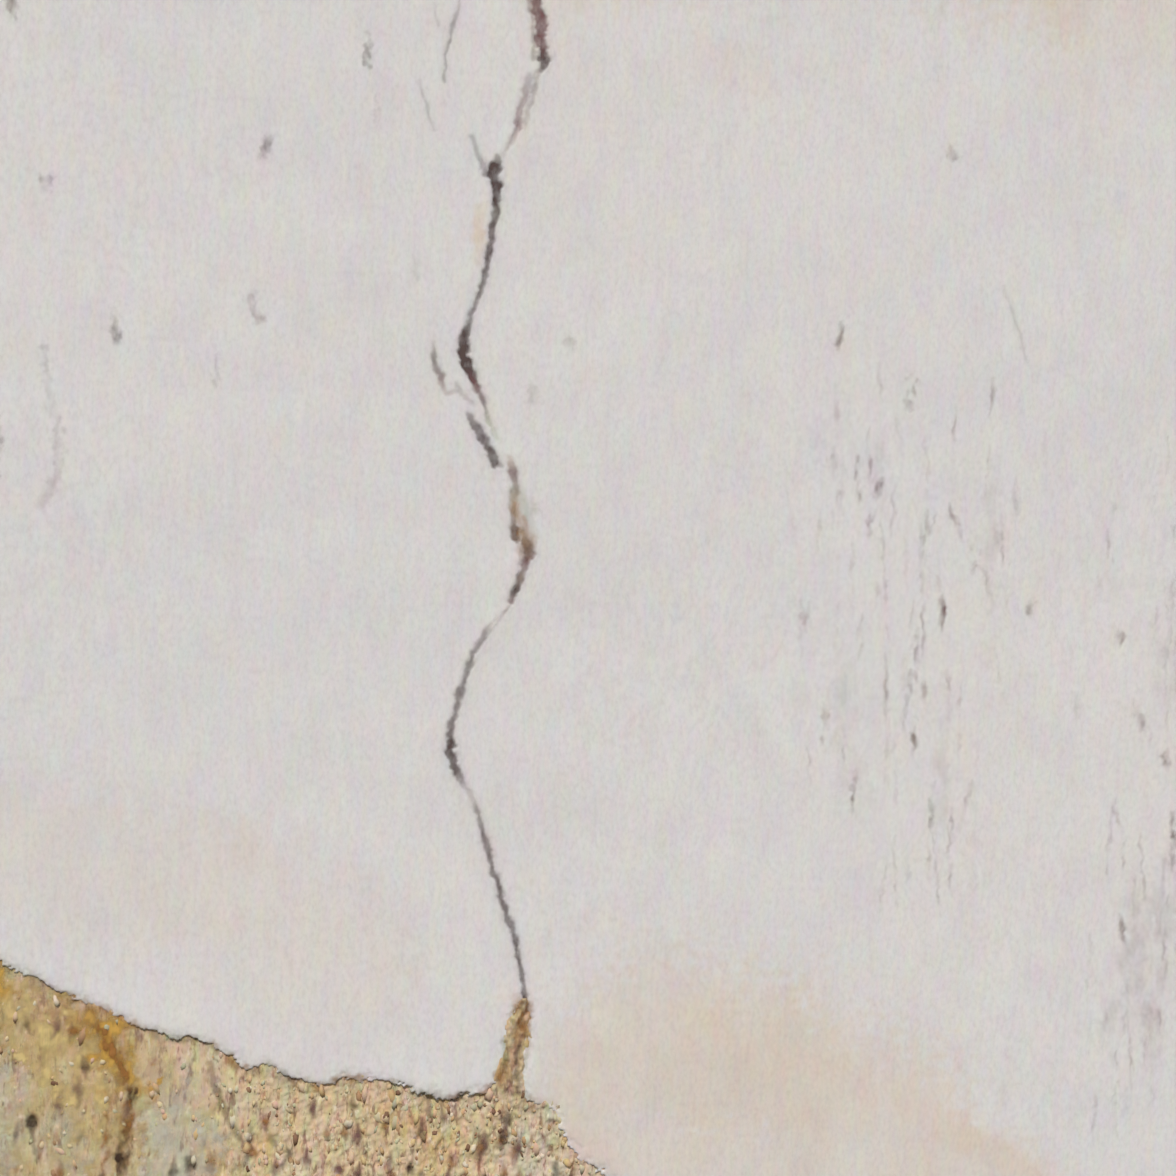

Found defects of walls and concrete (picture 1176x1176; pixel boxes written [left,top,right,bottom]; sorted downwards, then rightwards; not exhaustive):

crack [532,0,550,69]
crack [482,162,503,284]
crack [457,326,480,392]
crack [472,425,516,476]
crack [511,527,531,597]
crack [445,728,460,775]
crack [482,831,528,1008]
spalling [0,960,605,1176]